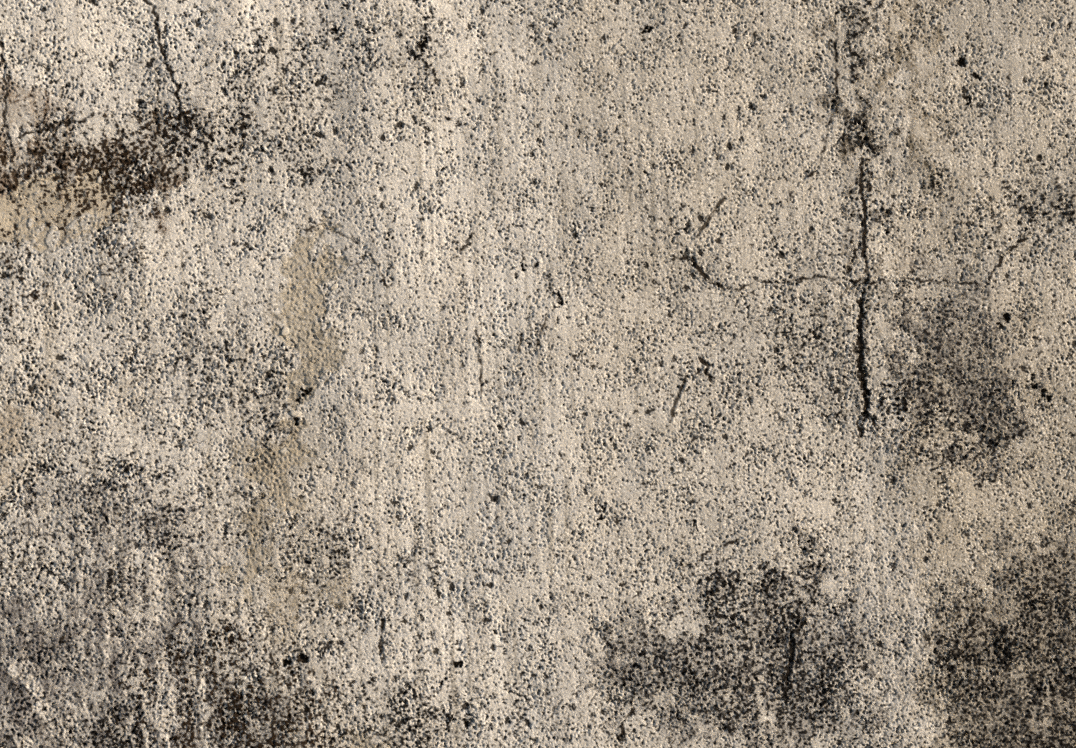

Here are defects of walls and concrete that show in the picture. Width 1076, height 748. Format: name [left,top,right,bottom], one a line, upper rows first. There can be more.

crack [144,0,192,126]
damp [0,0,459,318]
crack [789,8,839,201]
damp [115,290,297,476]
damp [303,403,363,490]
crack [672,157,1031,437]
damp [0,433,481,748]
damp [570,484,1076,748]